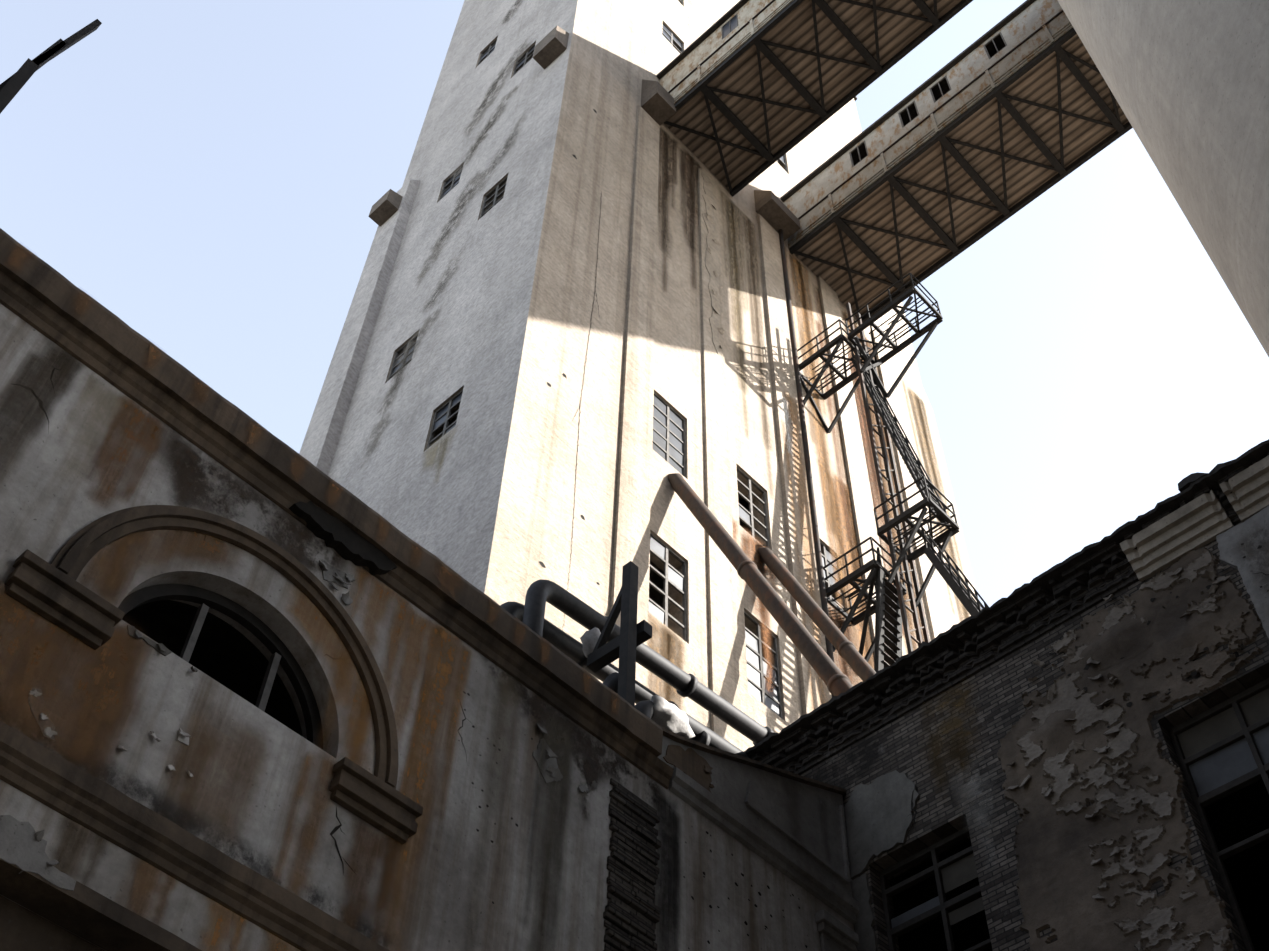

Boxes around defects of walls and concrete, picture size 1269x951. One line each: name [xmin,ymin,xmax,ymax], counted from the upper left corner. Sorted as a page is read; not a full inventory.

corrosion [12,248,31,266]
water stain [658,128,675,288]
corrosion [147,345,161,366]
corrosion [195,380,207,400]
water stain [722,193,768,439]
corrosion [92,400,163,503]
corrosion [784,249,874,668]
corrosion [843,312,924,650]
peeling [319,560,355,605]
corrosion [438,563,461,591]
peeling [1006,550,1250,951]
crack [330,807,349,873]